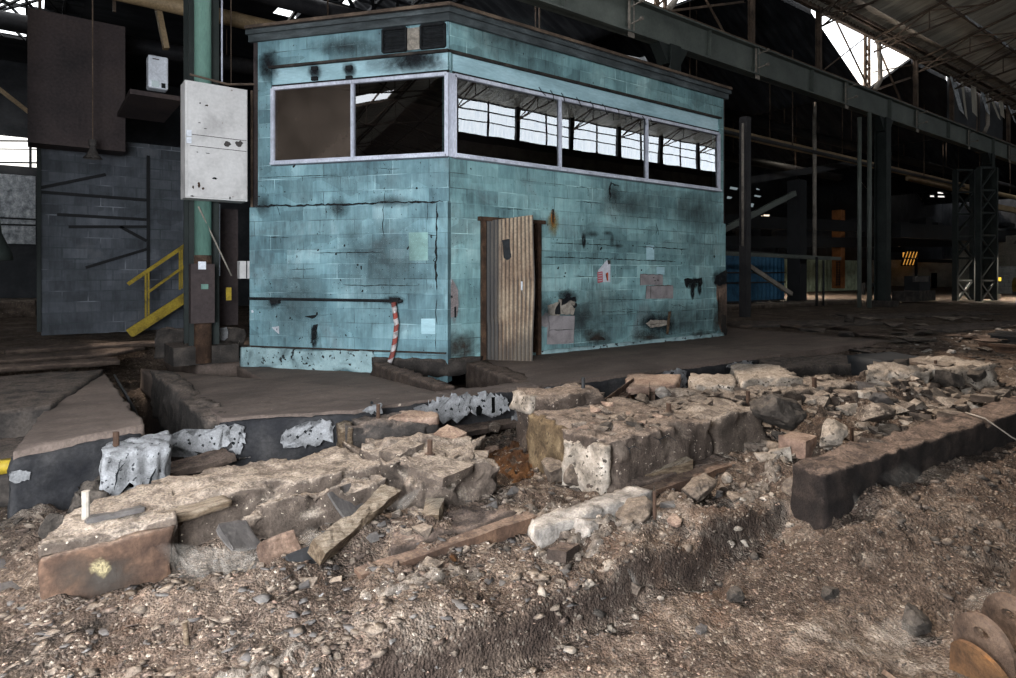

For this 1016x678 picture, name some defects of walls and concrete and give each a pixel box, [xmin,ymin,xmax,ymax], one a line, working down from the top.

crack [256,168,442,347]
flaking render [171,423,246,458]
flaking render [280,418,335,448]